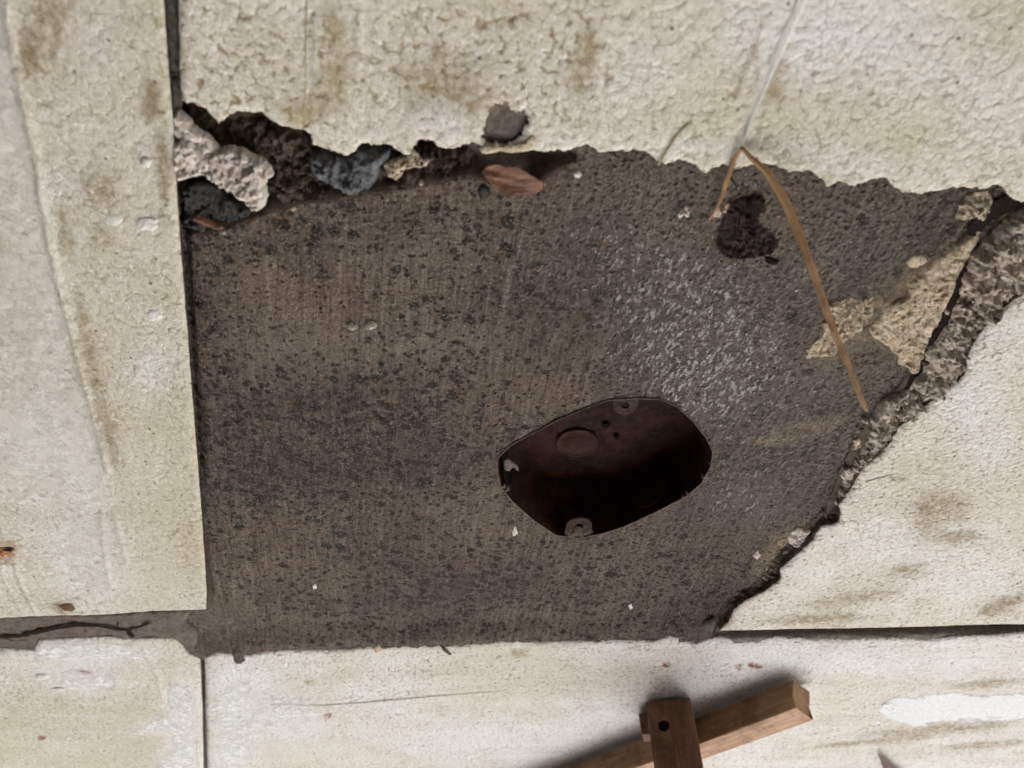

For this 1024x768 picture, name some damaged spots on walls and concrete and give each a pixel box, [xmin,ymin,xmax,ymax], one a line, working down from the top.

spalling [174,101,582,238]
crack [965,196,1024,237]
crack [904,262,975,390]
spalling [690,188,1024,638]
crack [0,622,152,641]
spalling [232,645,245,664]